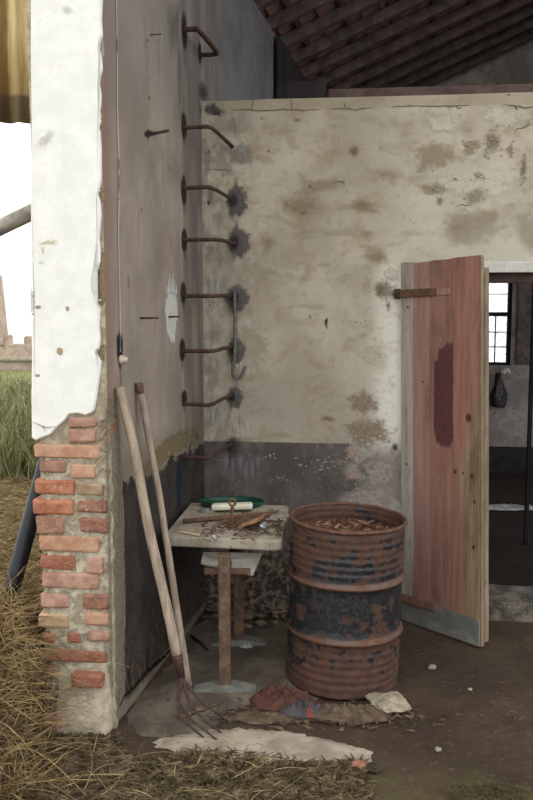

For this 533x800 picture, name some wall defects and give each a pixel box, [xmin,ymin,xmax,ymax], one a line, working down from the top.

crack [394,103,468,111]
leakage [352,391,377,413]
leakage [348,452,400,504]
flaking render [33,417,118,735]